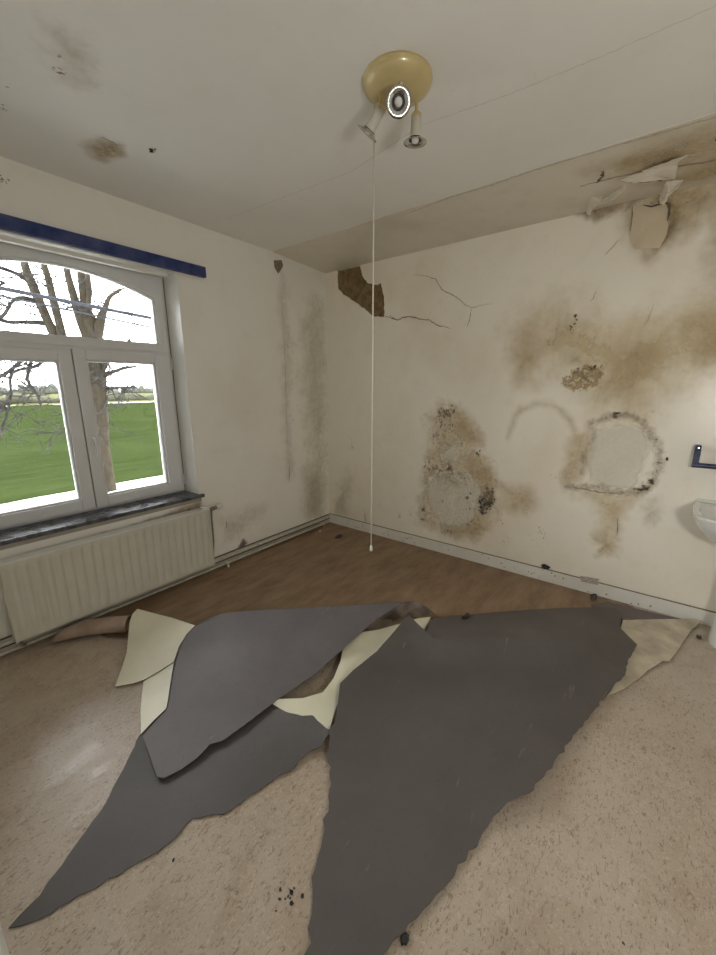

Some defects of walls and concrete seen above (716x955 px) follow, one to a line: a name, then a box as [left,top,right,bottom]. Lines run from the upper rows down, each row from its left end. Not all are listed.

peeling [586,155,688,215]
flaking render [337,266,385,318]
crack [385,275,485,328]
water stain [562,340,675,391]